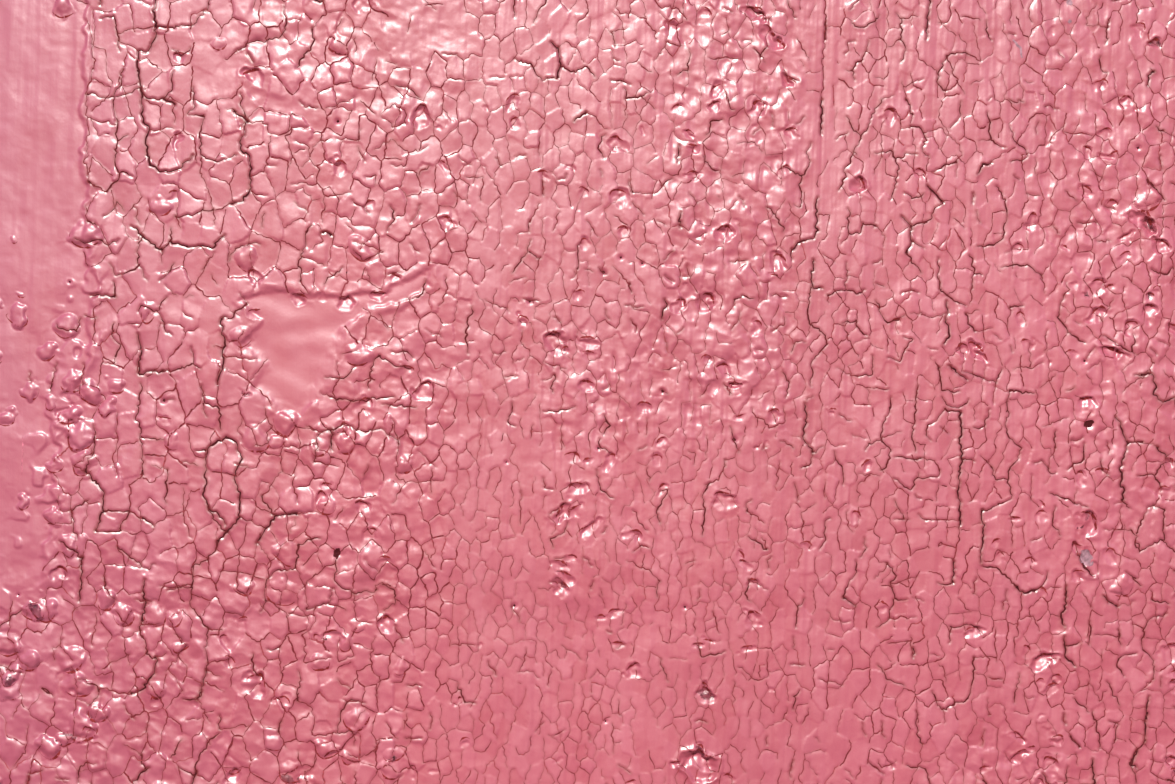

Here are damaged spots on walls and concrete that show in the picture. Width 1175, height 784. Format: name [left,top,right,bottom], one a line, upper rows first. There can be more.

crack [1009,0,1093,108]
crack [1099,58,1125,126]
crack [1086,0,1154,45]
peeling [234,262,437,421]
crack [344,302,411,361]
crack [354,355,411,388]
crack [475,290,519,415]
crack [653,259,725,395]
crack [729,386,786,437]
crack [978,290,1026,336]
crack [813,457,876,613]
crack [516,661,636,784]